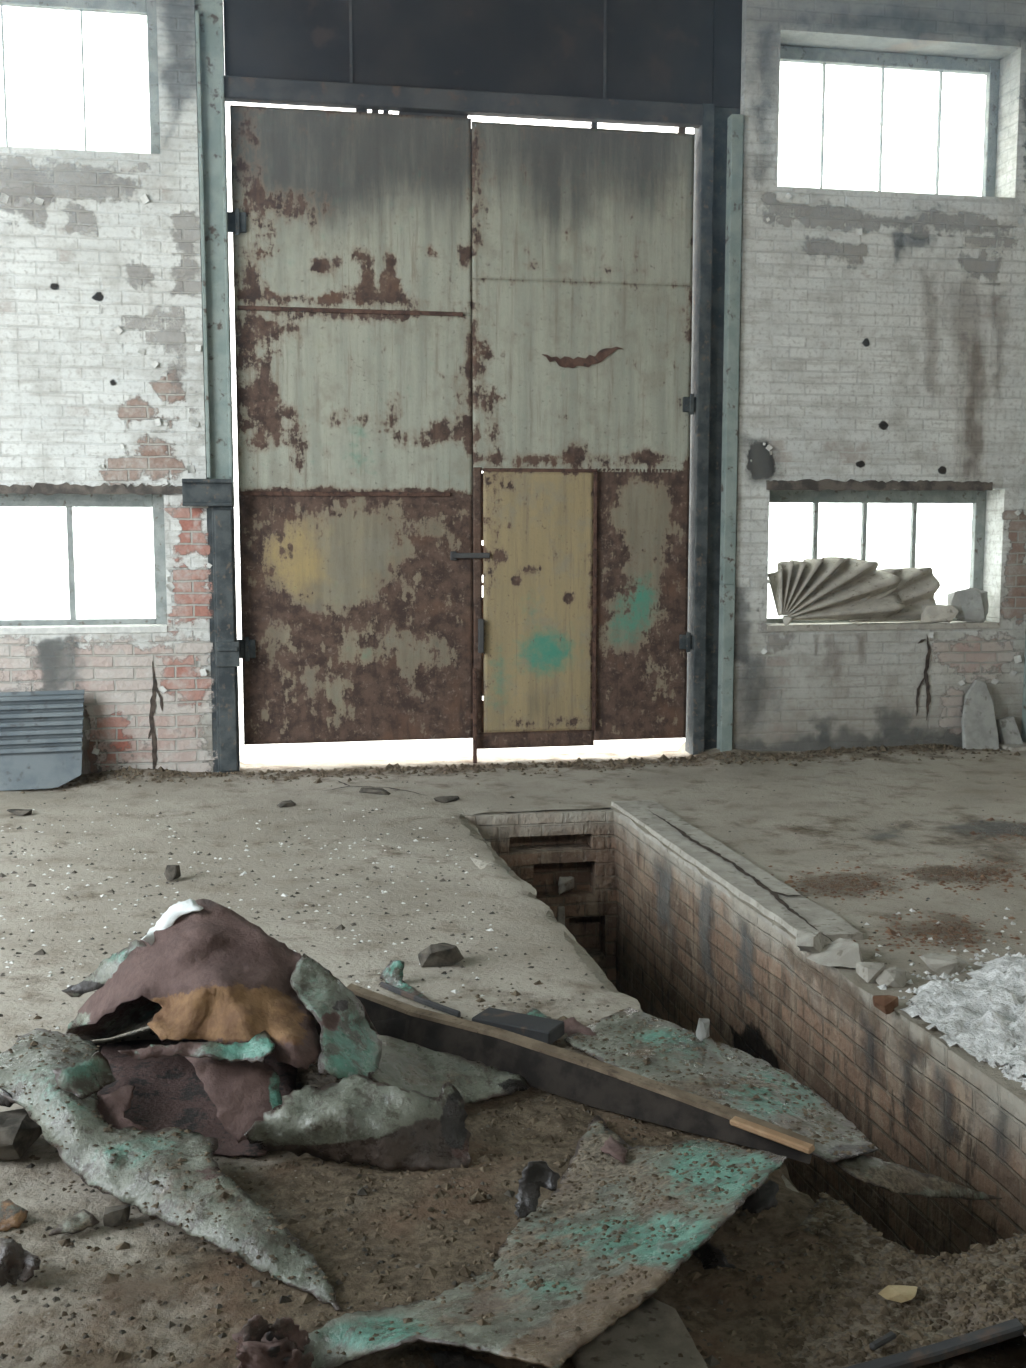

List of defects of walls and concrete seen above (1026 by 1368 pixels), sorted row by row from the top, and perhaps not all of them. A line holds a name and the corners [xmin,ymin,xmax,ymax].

spalling [0,348,218,772]
crack [148,661,163,769]
crack [916,636,931,720]